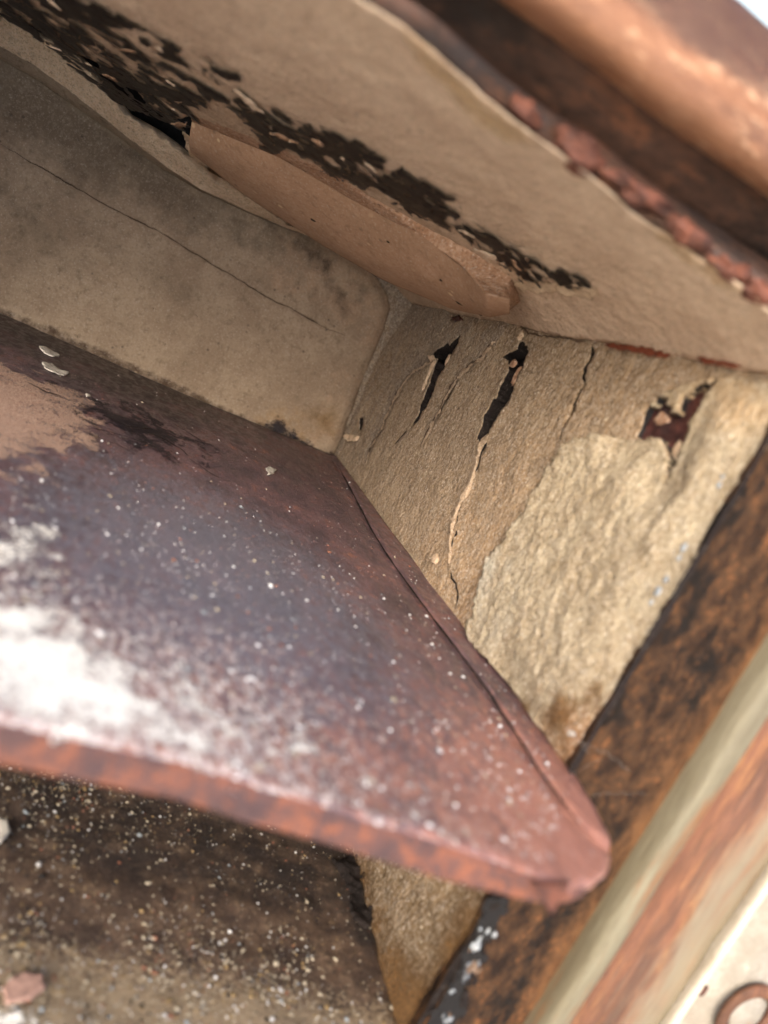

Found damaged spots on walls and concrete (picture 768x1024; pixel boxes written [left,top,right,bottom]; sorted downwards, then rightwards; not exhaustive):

crack [1,144,341,334]
spalling [0,0,599,301]
rust [509,91,768,307]
rust [0,362,106,488]
crack [395,315,463,444]
crack [448,325,595,605]
peeling [464,375,768,763]
rust [542,684,602,743]
damp [0,1005,49,1024]
rust [370,892,481,1024]